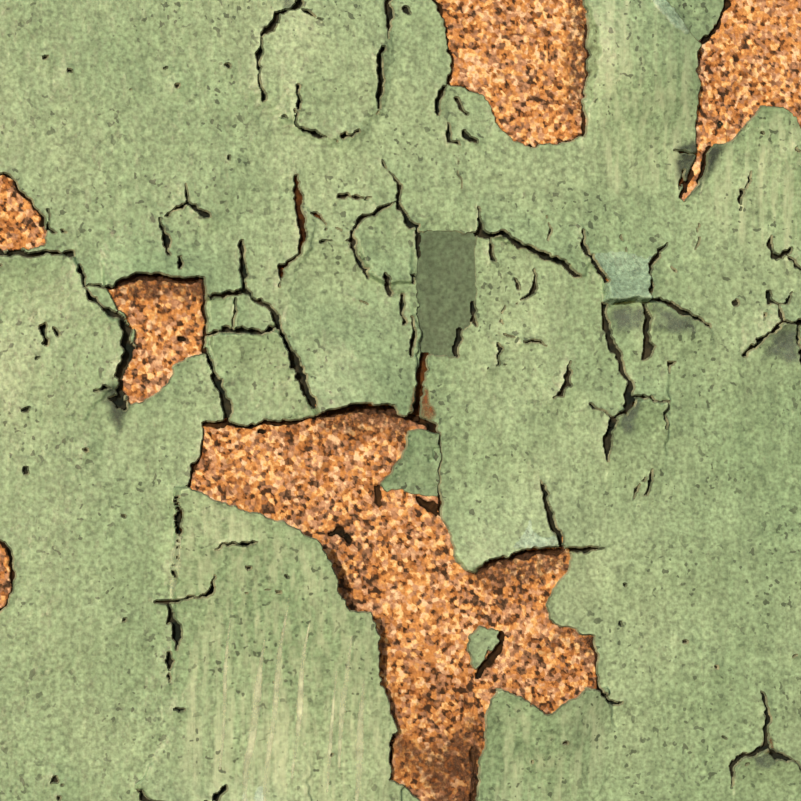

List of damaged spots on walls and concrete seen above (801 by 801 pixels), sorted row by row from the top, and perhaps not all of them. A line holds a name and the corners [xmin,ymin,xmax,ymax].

peeling [432,0,590,147]
peeling [652,0,801,201]
peeling [0,173,47,251]
crack [203,241,316,420]
crack [278,175,324,278]
crack [337,162,430,416]
crack [473,209,607,299]
crack [589,303,666,461]
crack [642,245,710,367]
peeling [740,251,801,397]
peeling [102,179,716,801]
peeling [0,541,15,611]